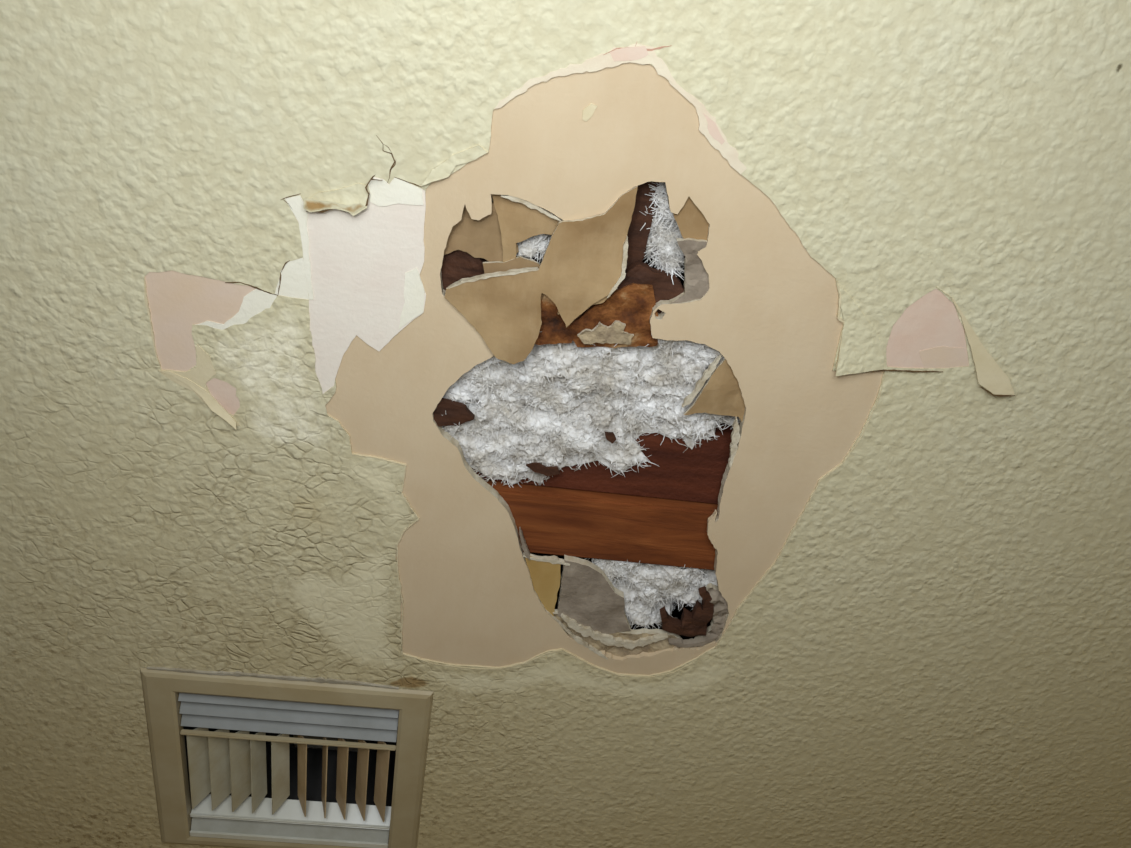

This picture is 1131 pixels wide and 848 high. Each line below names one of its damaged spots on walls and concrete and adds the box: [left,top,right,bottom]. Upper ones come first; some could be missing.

peeling [144,44,1015,703]